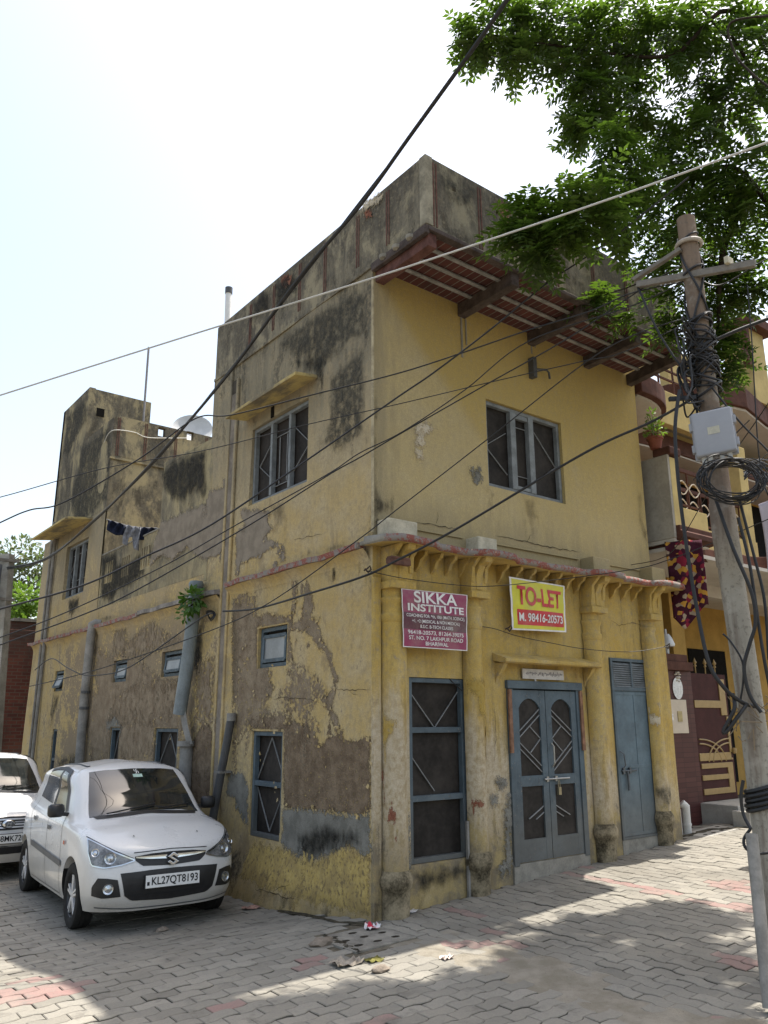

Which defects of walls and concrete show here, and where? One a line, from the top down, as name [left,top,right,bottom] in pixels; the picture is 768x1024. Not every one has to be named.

water stain [282,296,364,447]
water stain [65,404,110,517]
water stain [162,452,206,499]
water stain [101,548,151,600]
peeling [219,506,286,576]
peeling [226,579,397,862]
water stain [419,868,463,888]